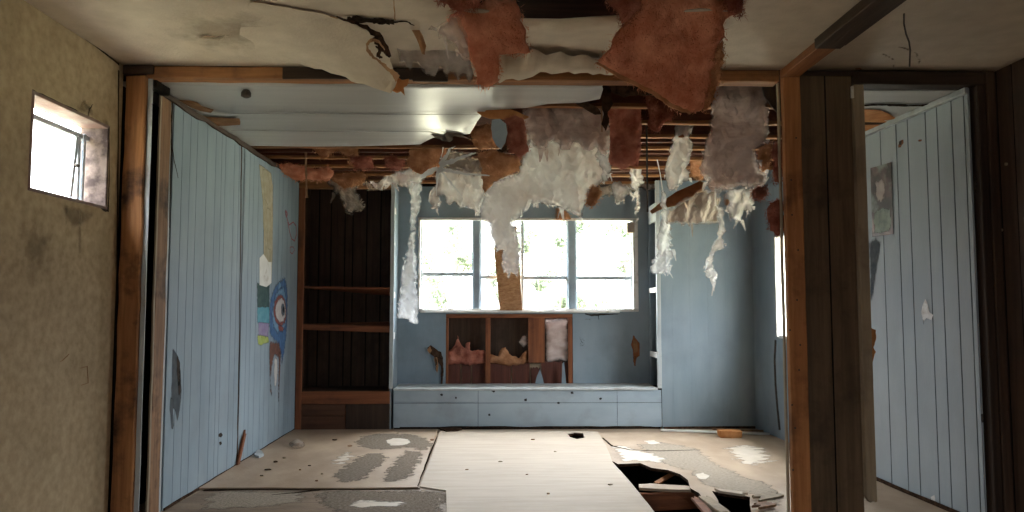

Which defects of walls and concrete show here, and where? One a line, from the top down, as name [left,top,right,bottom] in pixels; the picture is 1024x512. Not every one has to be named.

peeling [921,299,933,324]
spalling [637,442,780,512]